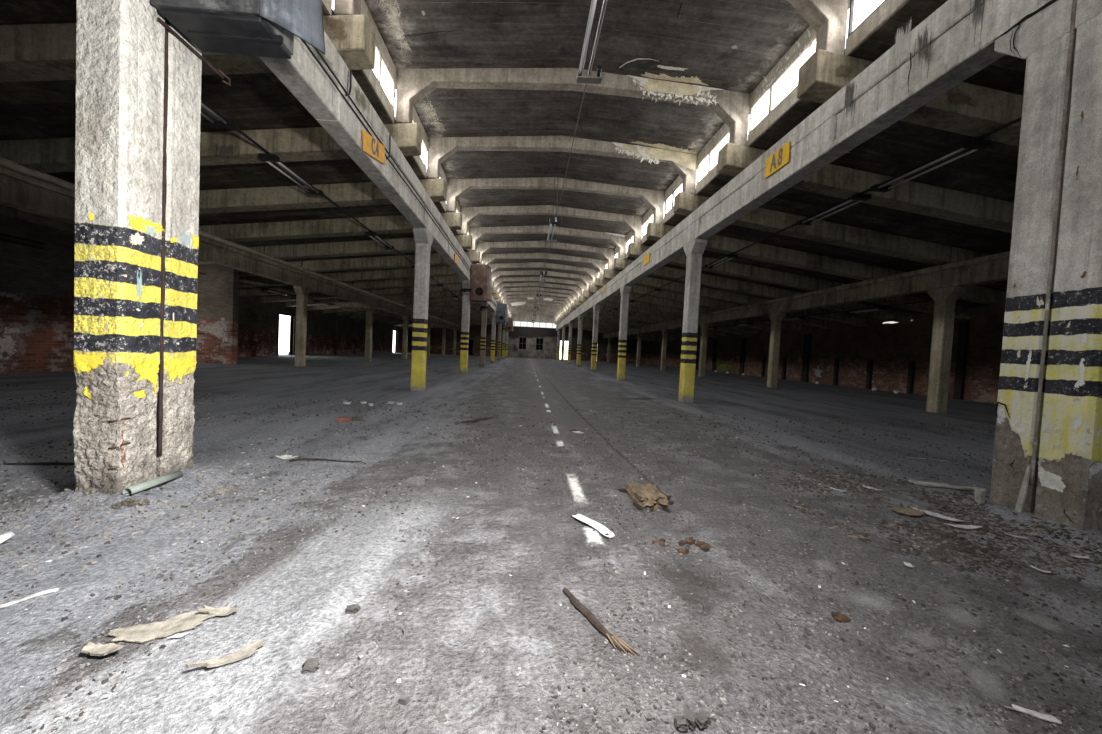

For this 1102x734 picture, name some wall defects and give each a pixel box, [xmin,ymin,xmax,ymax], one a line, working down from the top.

damp [378,0,410,50]
damp [887,22,932,83]
damp [969,0,985,42]
crack [1010,18,1023,57]
peeling [619,58,723,106]
peeling [612,141,697,170]
peeling [0,326,22,360]
peeling [197,317,230,345]
spalling [73,343,197,496]
spalling [989,402,1102,531]